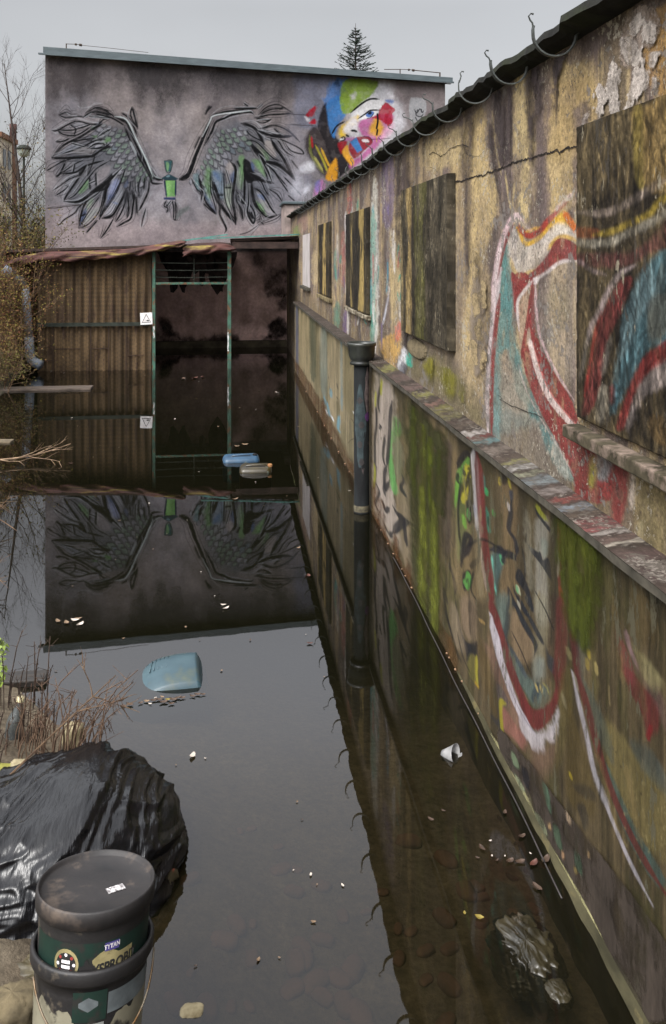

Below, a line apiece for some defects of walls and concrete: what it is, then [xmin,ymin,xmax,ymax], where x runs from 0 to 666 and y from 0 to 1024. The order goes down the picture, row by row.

peeling [582,4,660,125]
crack [428,144,576,183]
leakage [411,407,439,631]